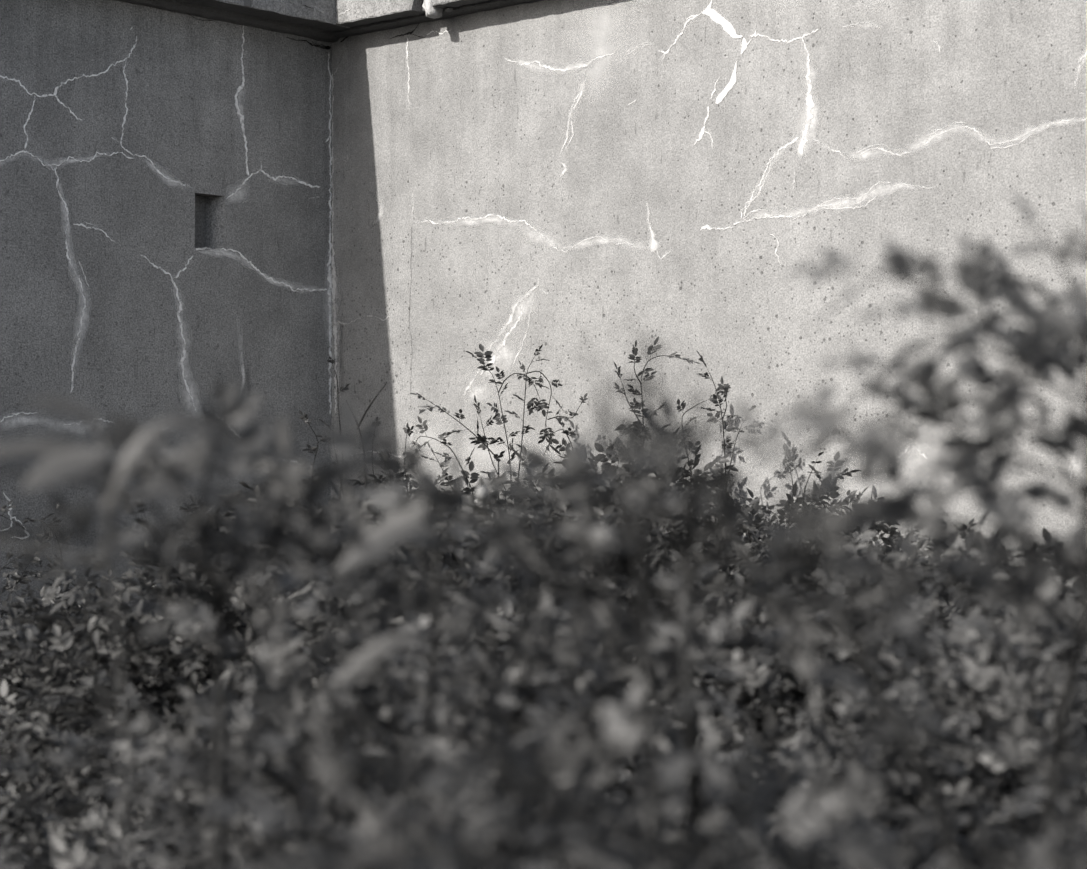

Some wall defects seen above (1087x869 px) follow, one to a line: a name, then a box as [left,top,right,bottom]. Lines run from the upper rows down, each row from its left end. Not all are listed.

crack [0,36,189,393]
crack [227,25,320,202]
crack [287,8,351,49]
crack [390,24,460,39]
crack [412,193,670,260]
crack [503,42,649,178]
spalling [659,0,751,147]
crack [844,21,878,29]
crack [700,29,1087,265]
crack [141,247,327,434]
crack [0,412,109,434]
crack [3,493,24,539]